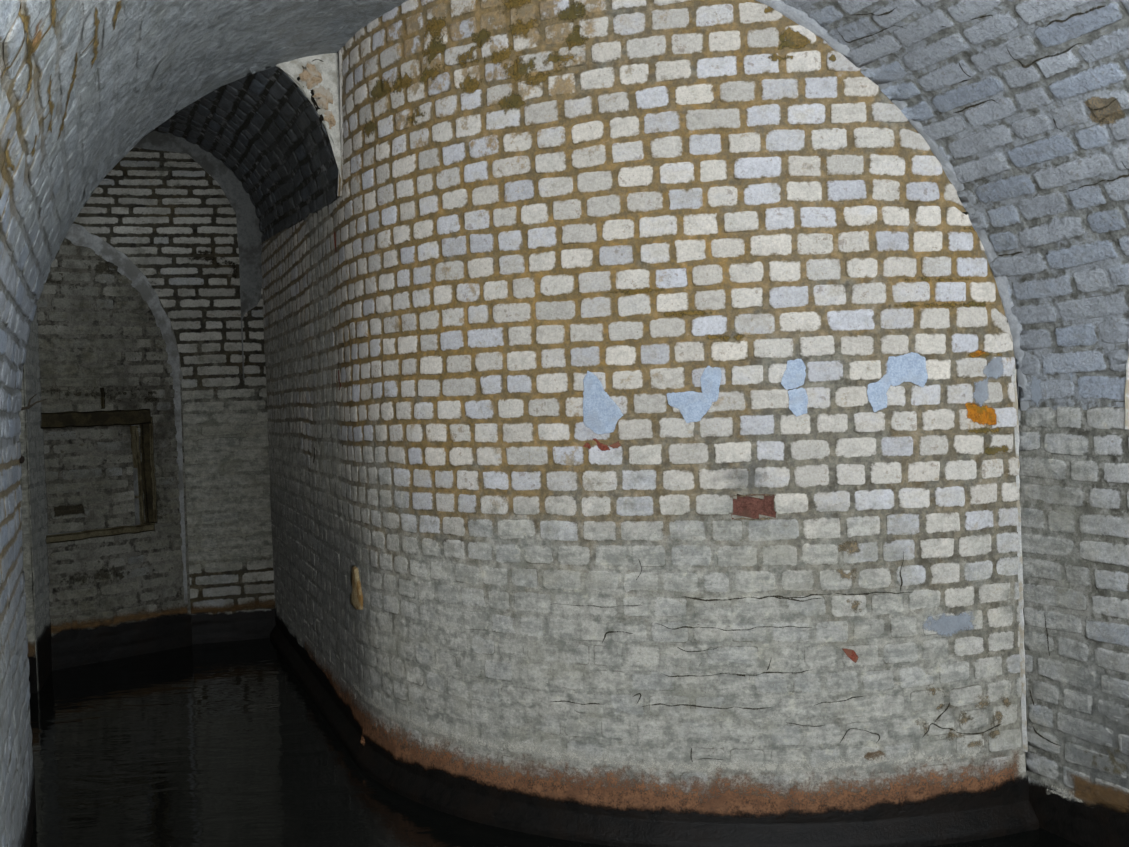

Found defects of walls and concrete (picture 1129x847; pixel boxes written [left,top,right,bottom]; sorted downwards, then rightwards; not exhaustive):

leakage [369,0,589,114]
leakage [768,27,811,61]
leakage [365,118,376,138]
leakage [406,107,426,124]
peeling [583,371,623,451]
peeling [666,366,722,423]
peeling [781,359,808,417]
peeling [867,352,928,412]
crack [550,551,912,677]
leakage [28,609,1129,847]
crack [633,693,880,743]
crack [922,703,1001,738]